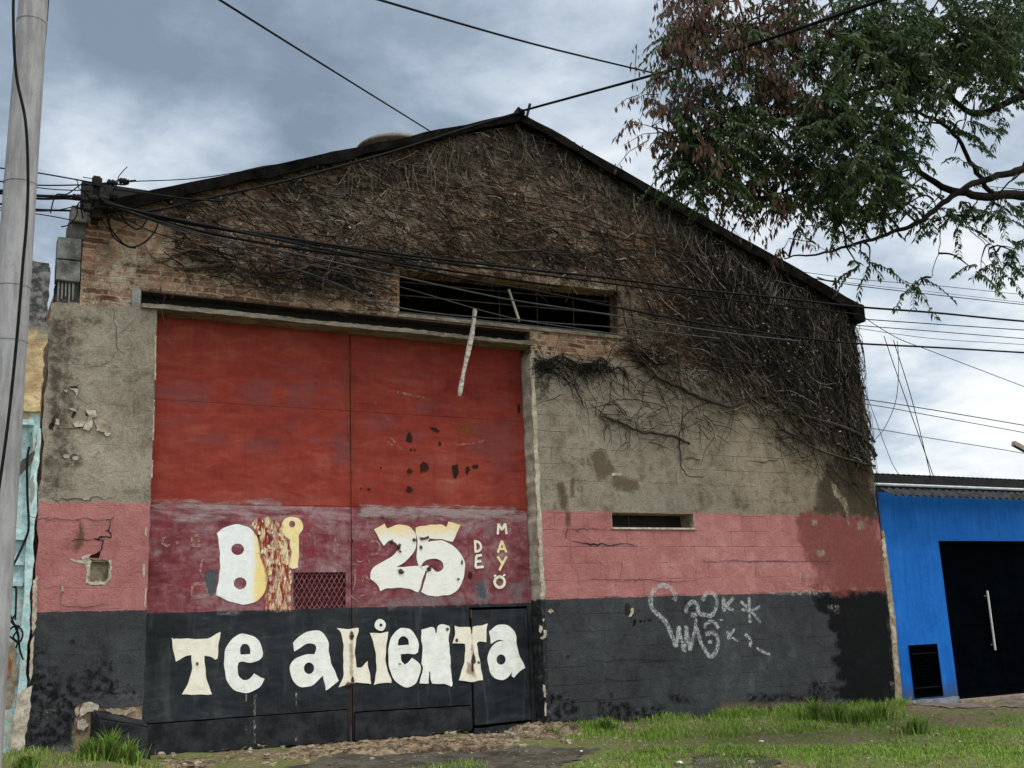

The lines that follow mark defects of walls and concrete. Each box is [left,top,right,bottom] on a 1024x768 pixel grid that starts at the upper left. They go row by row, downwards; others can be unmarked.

flaking render [48,385,112,437]
crack [30,496,114,554]
spalling [70,554,112,586]
peeling [251,517,292,611]
leakage [748,448,895,705]
flaking render [64,702,139,754]